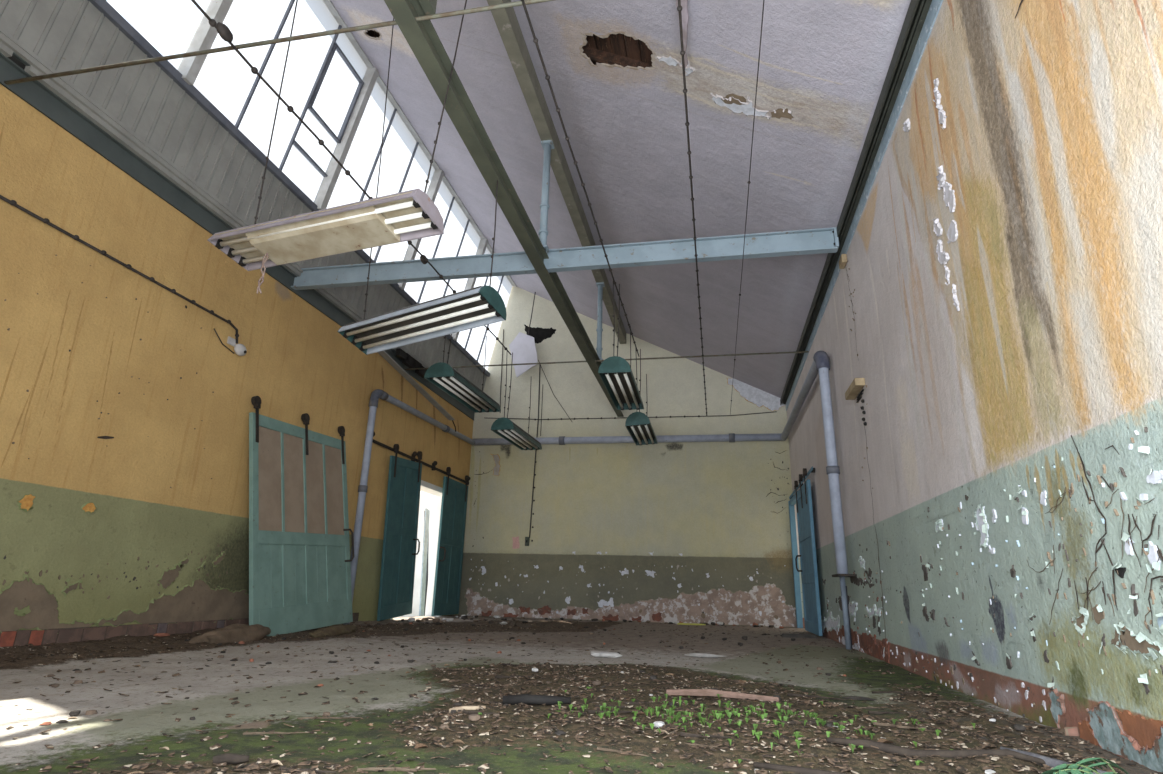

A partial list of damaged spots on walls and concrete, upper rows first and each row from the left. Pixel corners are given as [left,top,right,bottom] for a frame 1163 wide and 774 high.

water stain [953,0,1163,448]
peeling [17,494,36,512]
water stain [0,279,90,481]
peeling [0,544,249,647]
flaking render [464,551,797,628]
flaking render [820,457,1163,697]
flaking render [994,533,1163,774]
crack [1027,435,1163,626]
peeling [1128,427,1150,454]